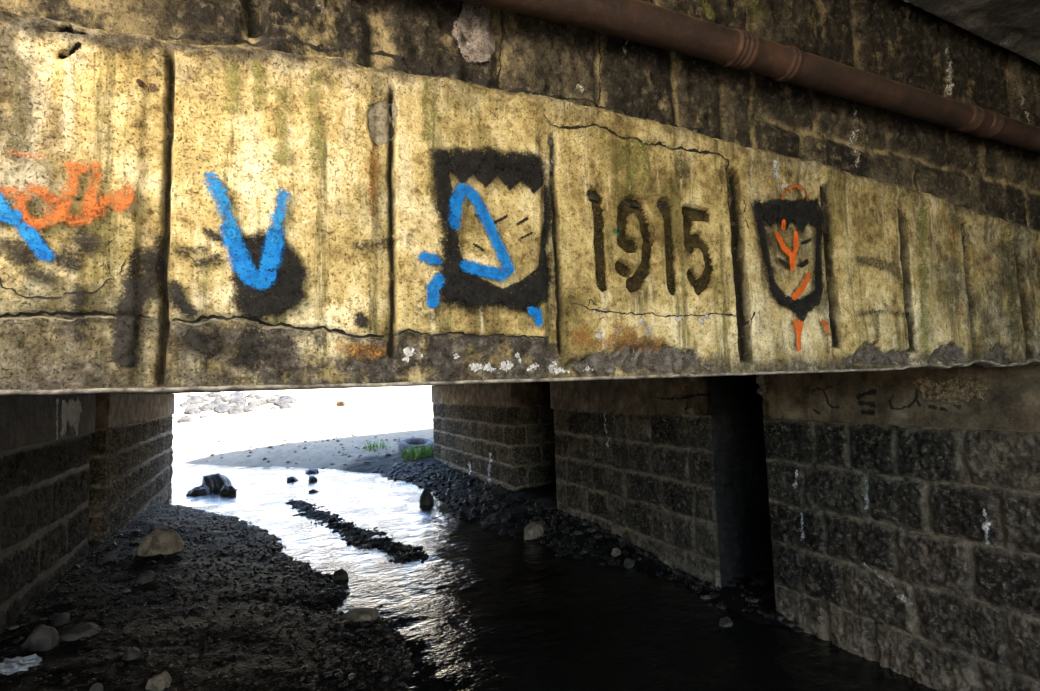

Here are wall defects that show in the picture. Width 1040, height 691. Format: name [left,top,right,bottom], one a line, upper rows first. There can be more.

peeling [452,1,495,63]
water stain [222,61,291,163]
water stain [305,69,324,168]
spalling [367,100,398,146]
crack [168,9,749,228]
crack [0,239,548,374]
rust [335,341,385,360]
water stain [401,346,423,363]
water stain [453,352,570,375]
rust [571,323,665,351]
water stain [982,508,991,545]